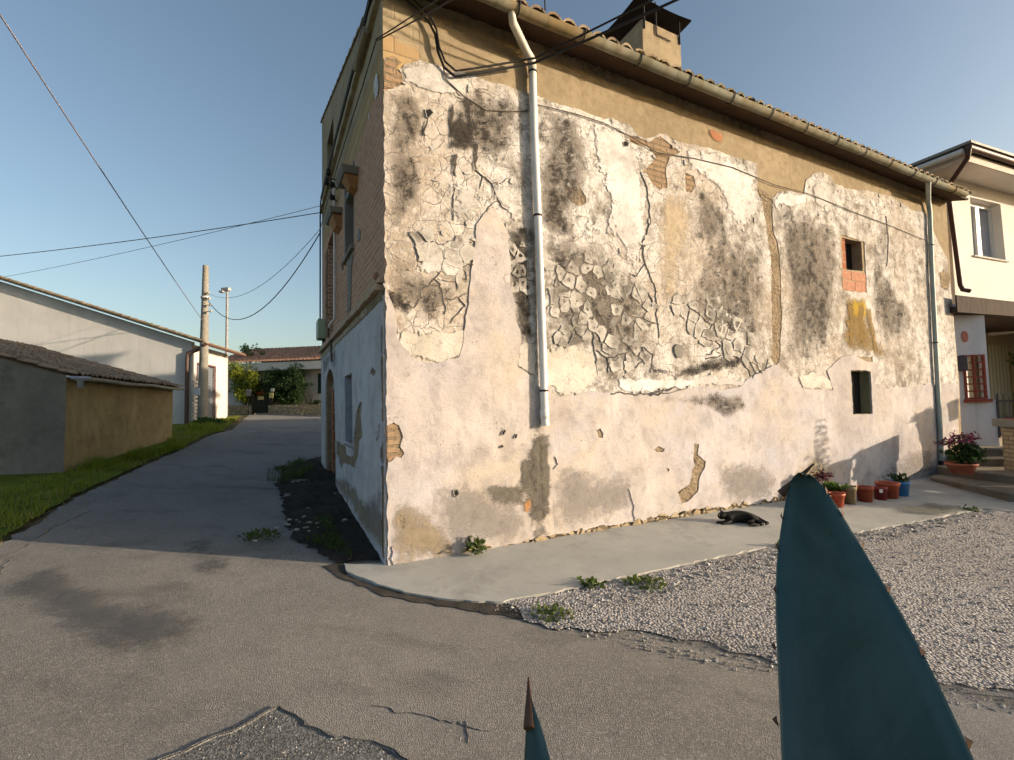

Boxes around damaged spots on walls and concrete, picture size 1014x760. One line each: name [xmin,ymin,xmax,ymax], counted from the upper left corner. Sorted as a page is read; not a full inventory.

crack [411,184,474,323]
water stain [449,90,523,188]
crack [475,170,509,210]
water stain [509,228,532,337]
crack [546,172,686,396]
water stain [539,105,744,377]
peeling [408,118,902,395]
crack [697,312,770,378]
spalling [336,402,362,467]
spalling [380,422,404,465]
water stain [394,427,630,564]
spalling [678,444,705,504]